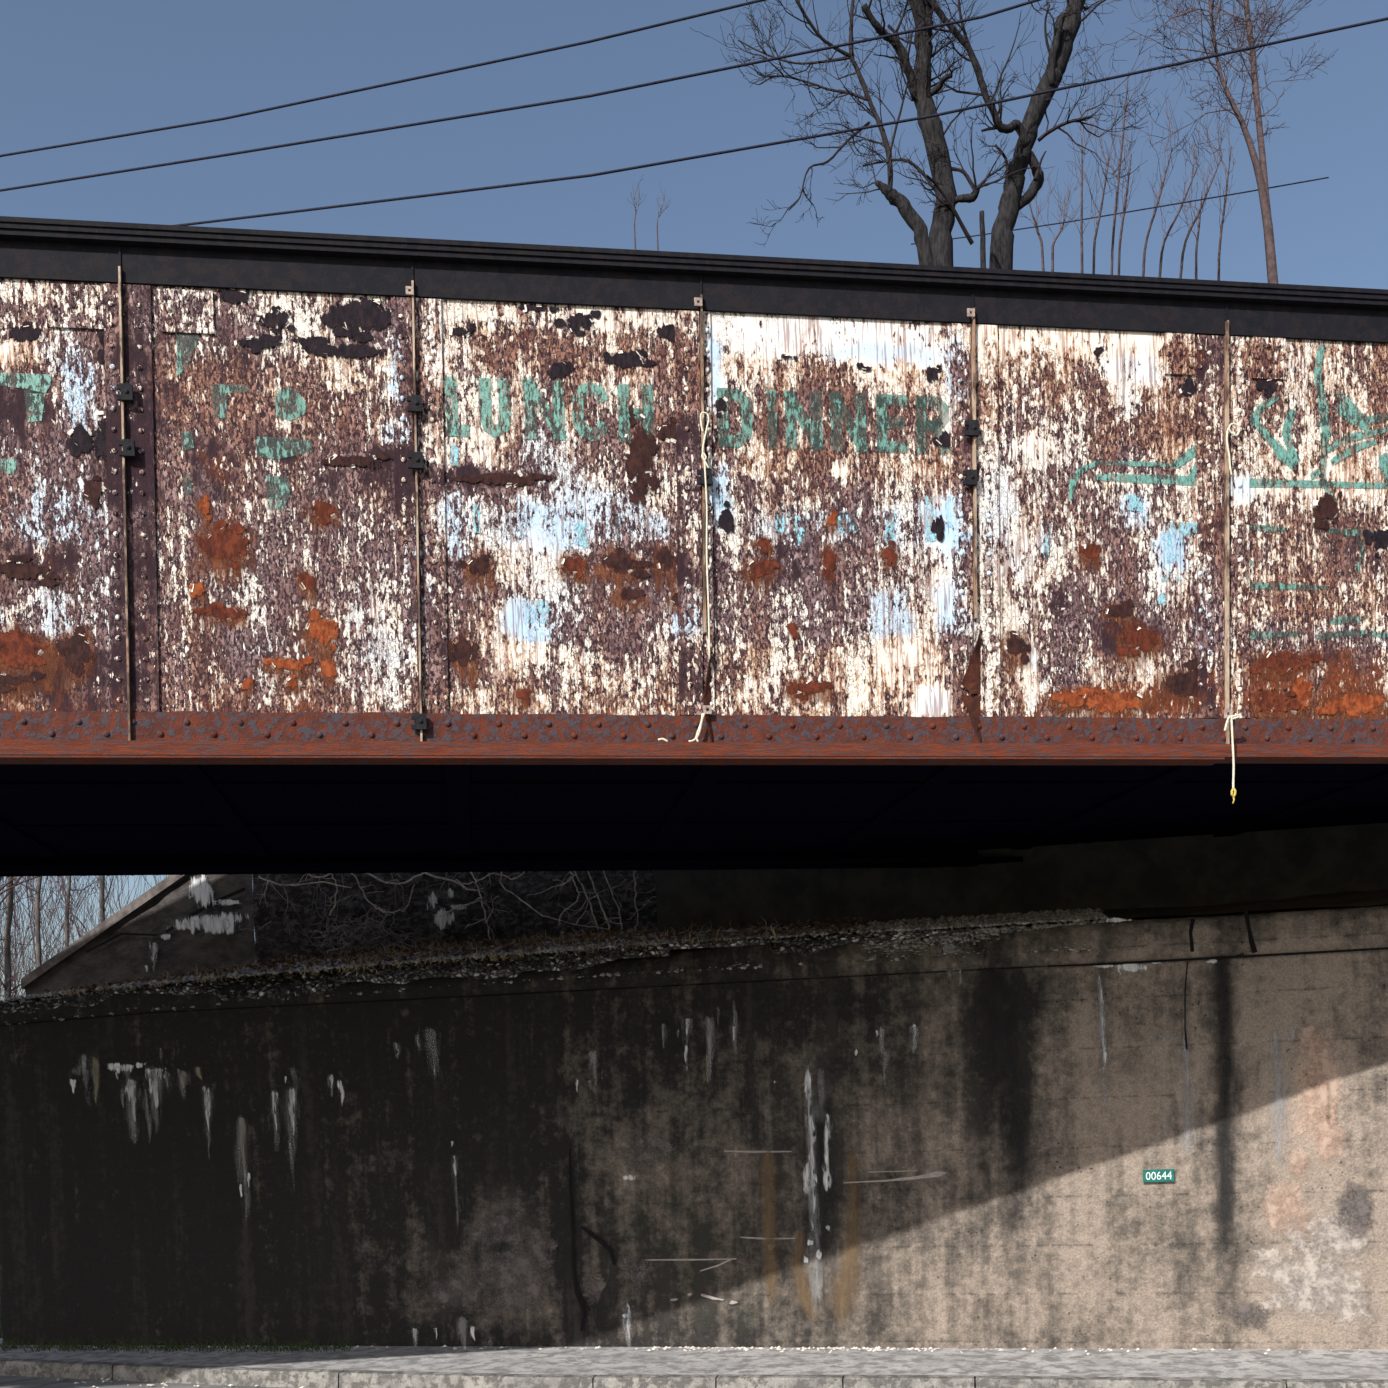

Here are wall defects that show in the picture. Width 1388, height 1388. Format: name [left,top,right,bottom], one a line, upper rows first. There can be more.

peeling [229,296,392,359]
peeling [518,304,601,337]
peeling [623,406,676,505]
peeling [931,514,947,542]
corrosion [558,546,678,613]
corrosion [0,626,93,702]
corrosion [239,570,339,707]
corrosion [1048,658,1198,718]
damp [145,875,248,971]
damp [91,1057,163,1122]
damp [272,1076,295,1134]
damp [803,1070,831,1263]